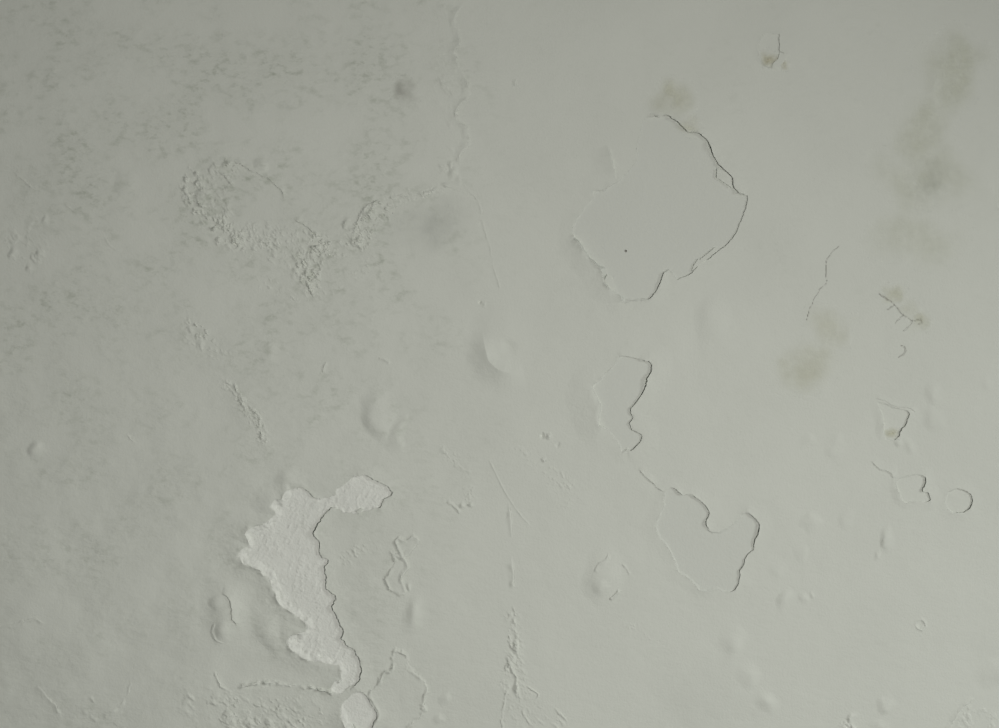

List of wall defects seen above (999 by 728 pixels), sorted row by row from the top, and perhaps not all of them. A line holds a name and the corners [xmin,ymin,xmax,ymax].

peeling [756,28,791,73]
peeling [559,92,764,316]
crack [879,294,923,358]
peeling [569,344,773,601]
peeling [220,461,405,728]